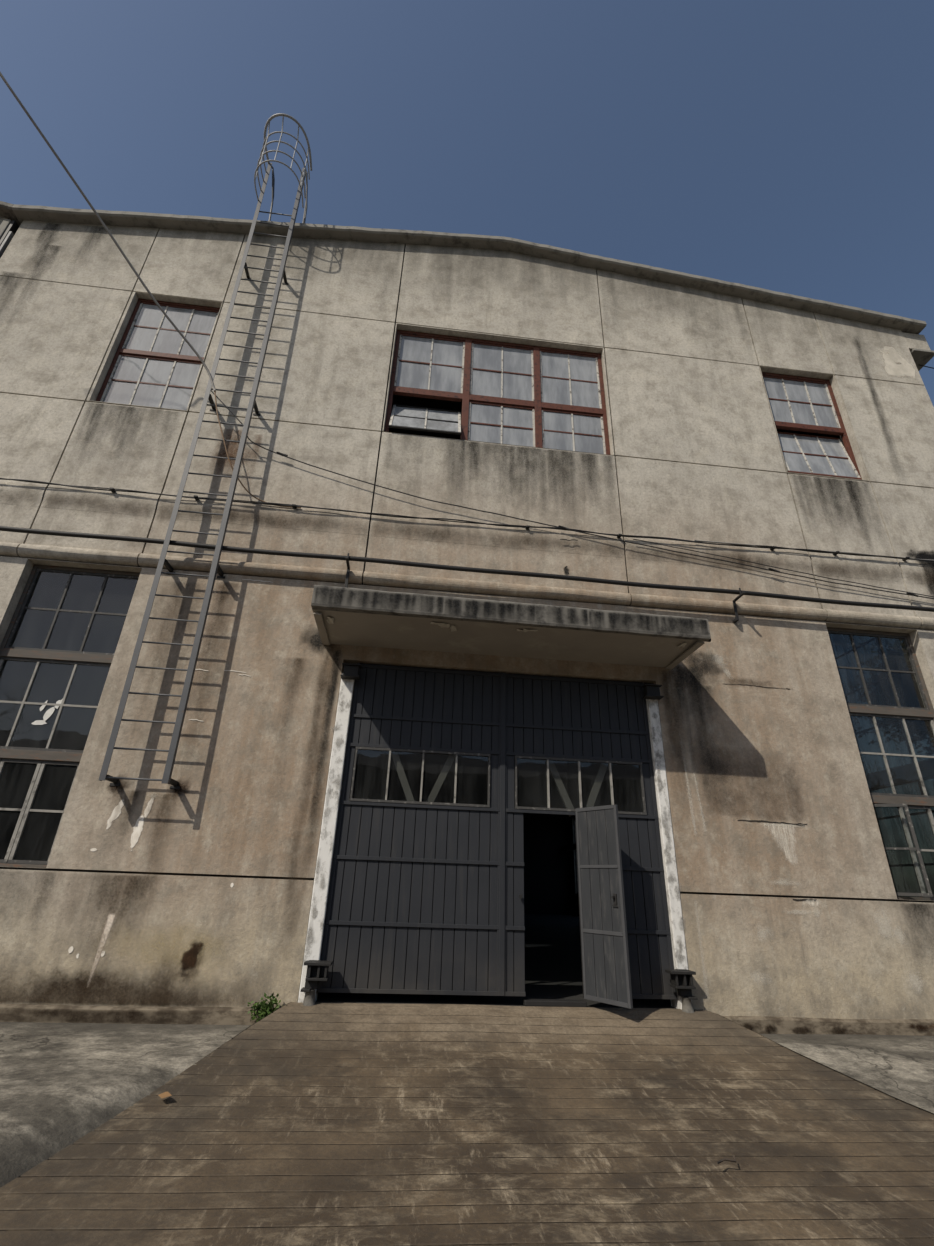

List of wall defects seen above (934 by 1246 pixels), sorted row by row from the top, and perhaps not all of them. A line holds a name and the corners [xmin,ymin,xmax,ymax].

water stain [818,479,860,516]
water stain [910,550,934,594]
water stain [664,654,730,722]
peeling [106,799,124,829]
peeling [130,795,154,851]
peeling [94,915,115,966]
water stain [1,975,195,1006]